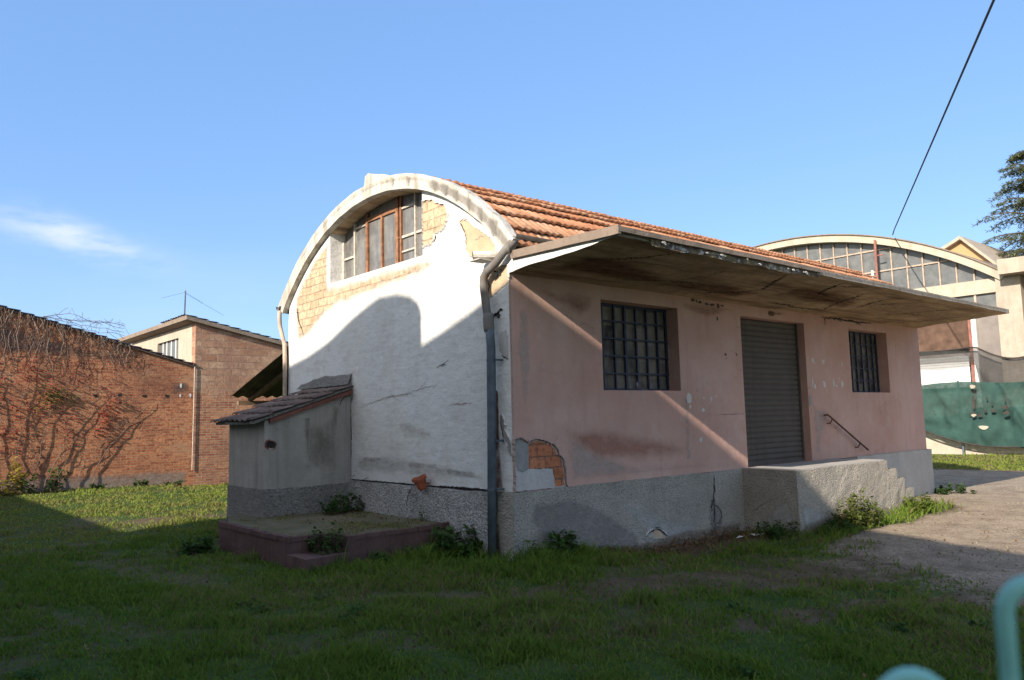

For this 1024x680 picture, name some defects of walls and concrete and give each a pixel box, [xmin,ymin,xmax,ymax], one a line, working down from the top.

flaking render [421,197,497,258]
spalling [651,239,819,278]
crack [340,360,472,406]
flaking render [499,413,568,493]
crack [711,478,722,531]